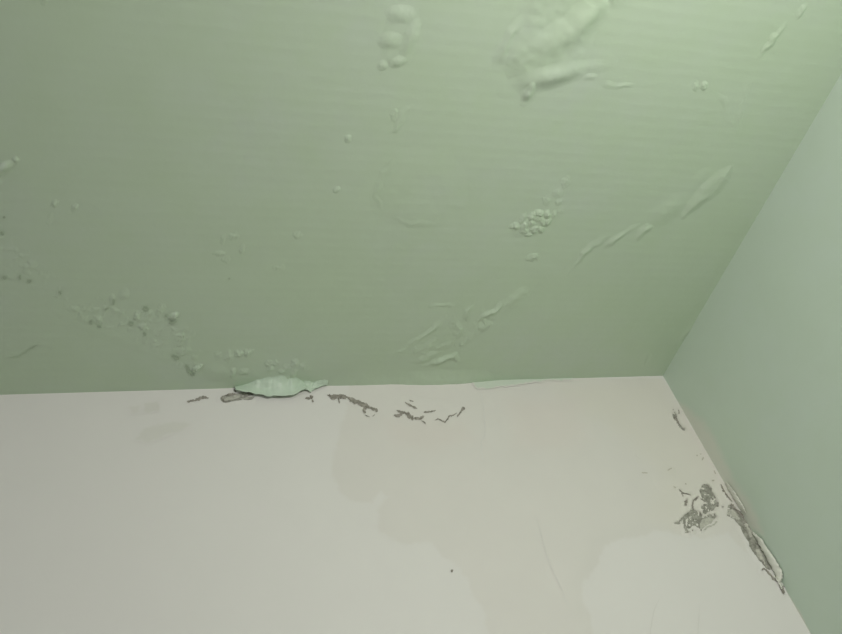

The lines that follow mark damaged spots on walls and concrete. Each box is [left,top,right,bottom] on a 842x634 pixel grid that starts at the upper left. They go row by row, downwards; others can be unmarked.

peeling [216,375,328,406]